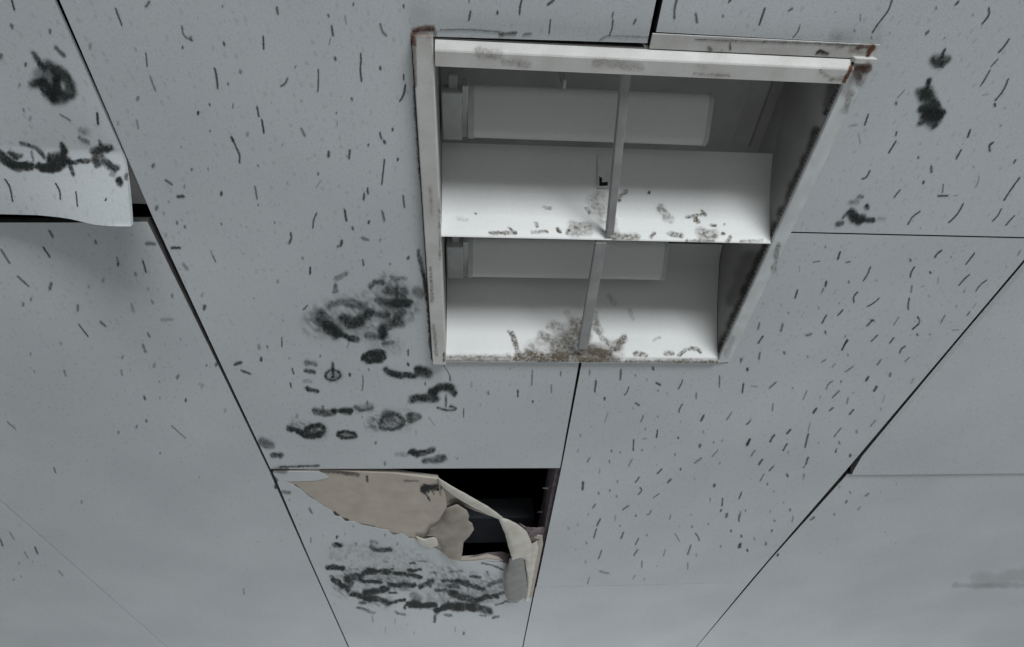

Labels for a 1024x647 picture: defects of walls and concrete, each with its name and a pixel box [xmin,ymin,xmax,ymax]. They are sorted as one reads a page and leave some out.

corrosion [411,26,435,54]
water stain [29,52,76,103]
corrosion [842,44,876,83]
water stain [917,48,951,129]
water stain [0,136,128,186]
water stain [836,195,875,226]
water stain [304,361,341,381]
water stain [316,278,457,431]
water stain [287,403,372,440]
water stain [259,440,368,482]
water stain [408,448,446,463]
water stain [326,562,508,623]